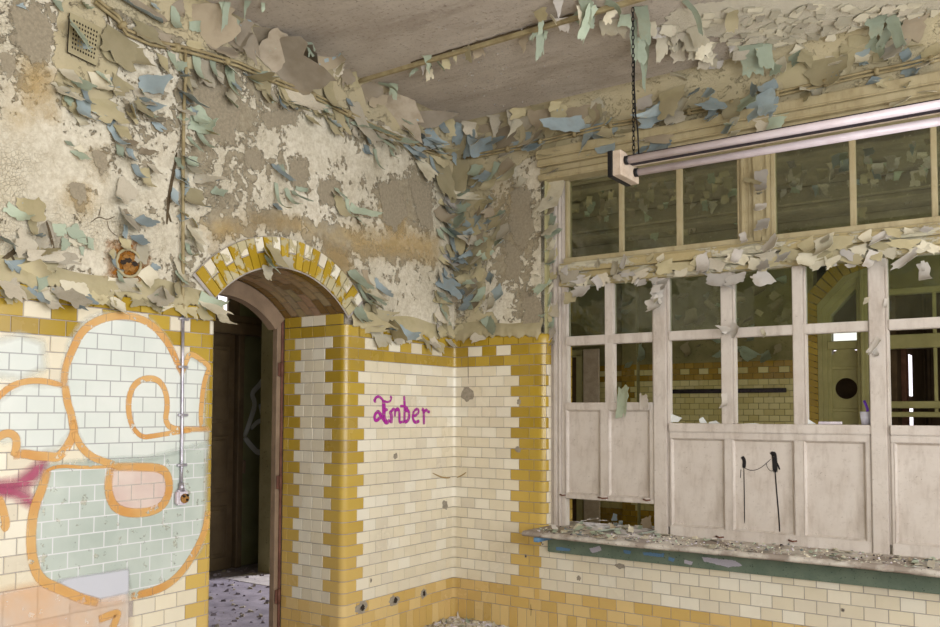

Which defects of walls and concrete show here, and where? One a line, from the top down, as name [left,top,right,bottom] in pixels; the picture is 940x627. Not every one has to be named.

peeling [0,0,940,363]
rust [109,242,148,278]
spalling [461,387,474,402]
peeling [615,384,649,418]
spalling [355,601,368,614]